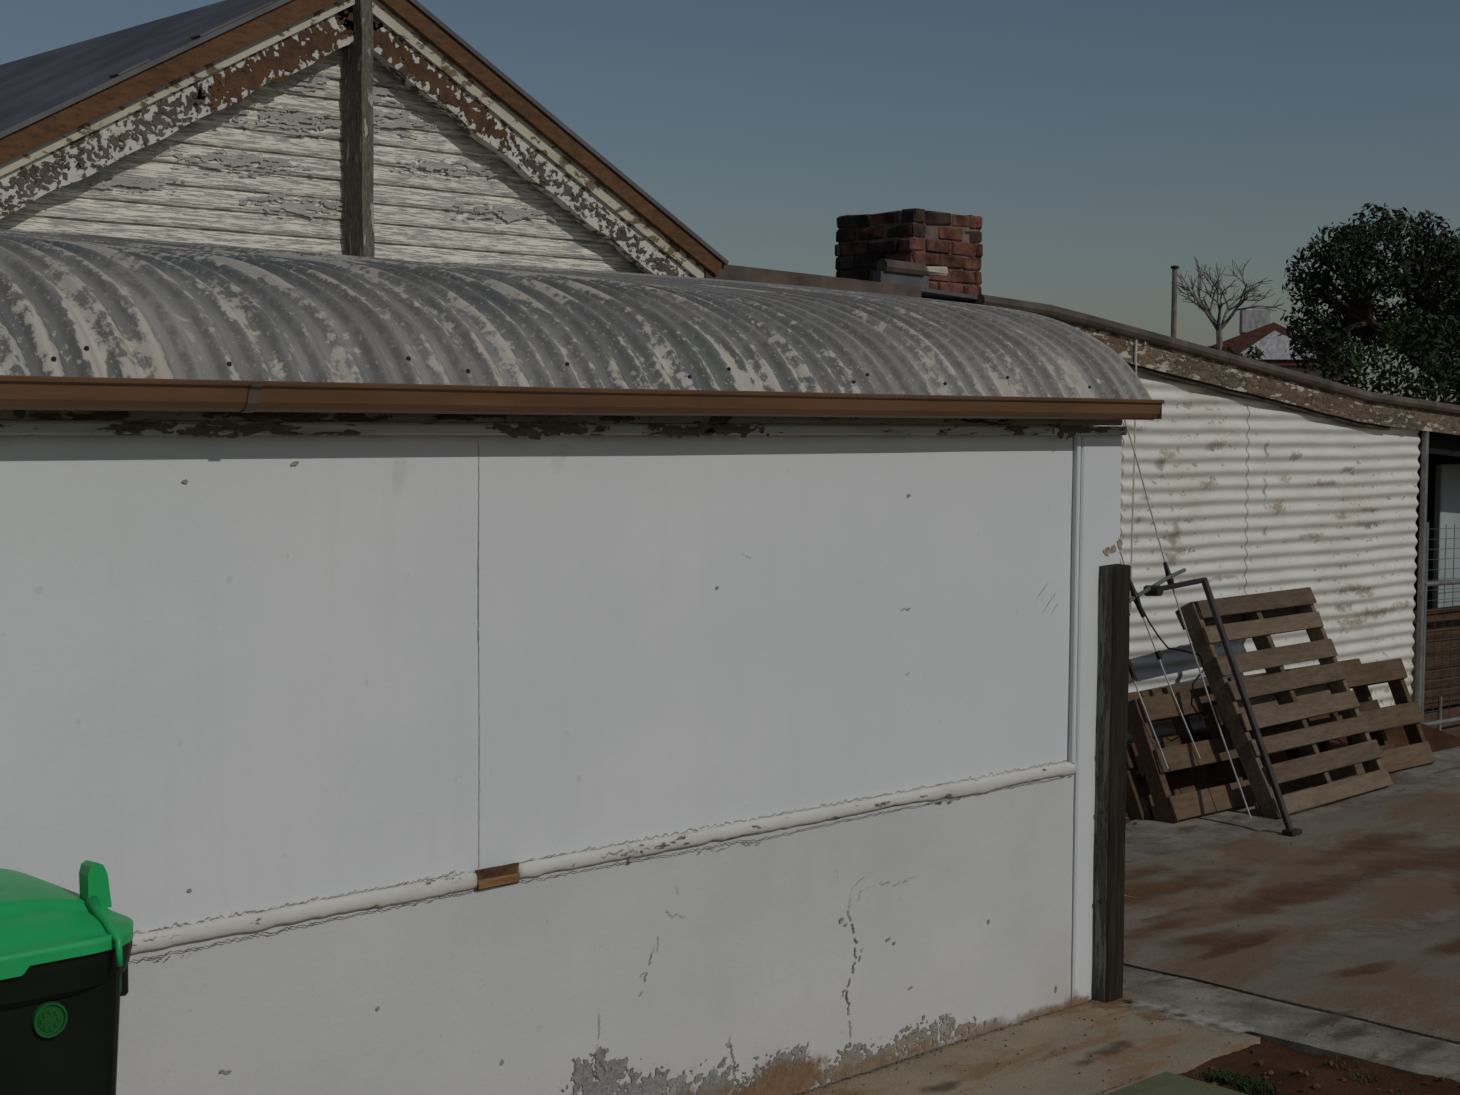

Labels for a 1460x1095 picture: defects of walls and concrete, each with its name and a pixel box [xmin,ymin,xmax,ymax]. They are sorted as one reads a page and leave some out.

peeling [0,9,355,210]
peeling [373,17,676,276]
peeling [1082,328,1253,392]
peeling [15,410,71,419]
peeling [91,411,393,438]
peeling [485,416,774,440]
peeling [1053,423,1109,440]
spalling [562,1013,997,1095]